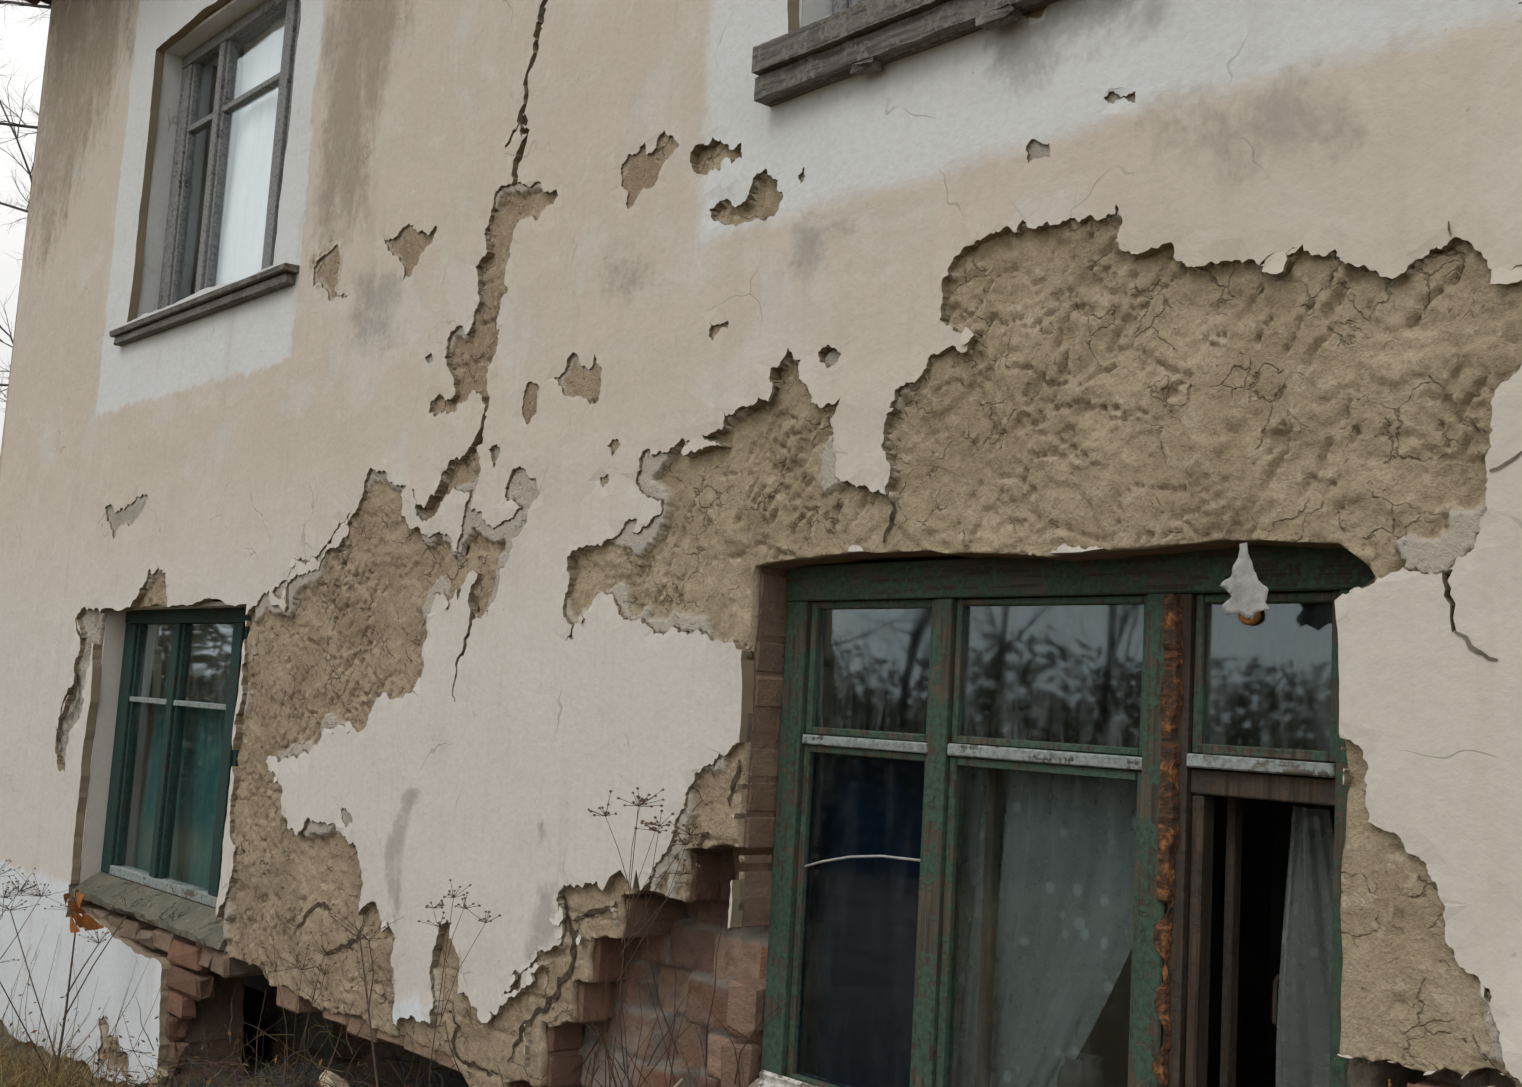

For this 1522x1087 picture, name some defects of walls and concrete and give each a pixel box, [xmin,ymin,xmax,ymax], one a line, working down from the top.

flaking render [622,133,679,208]
spalling [698,142,742,175]
spalling [711,172,783,226]
flaking render [386,225,437,277]
spalling [566,209,1522,660]
flaking render [107,495,148,537]
crack [1446,573,1498,661]
spalling [58,570,170,766]
spalling [221,446,753,1087]
spalling [1339,739,1522,1087]